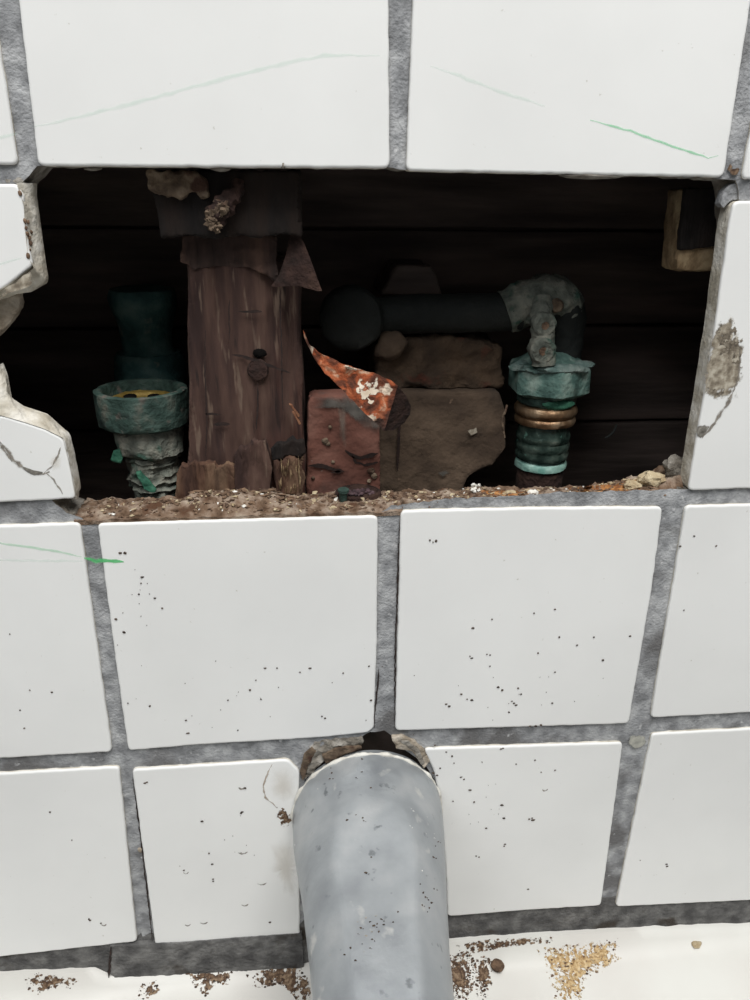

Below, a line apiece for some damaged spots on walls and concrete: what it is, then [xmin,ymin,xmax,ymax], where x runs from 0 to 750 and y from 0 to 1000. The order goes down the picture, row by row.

spalling [0,183,48,299]
spalling [0,363,64,438]
spalling [697,318,743,438]
crack [0,442,63,494]
spalling [66,449,683,525]
peeling [300,745,362,780]